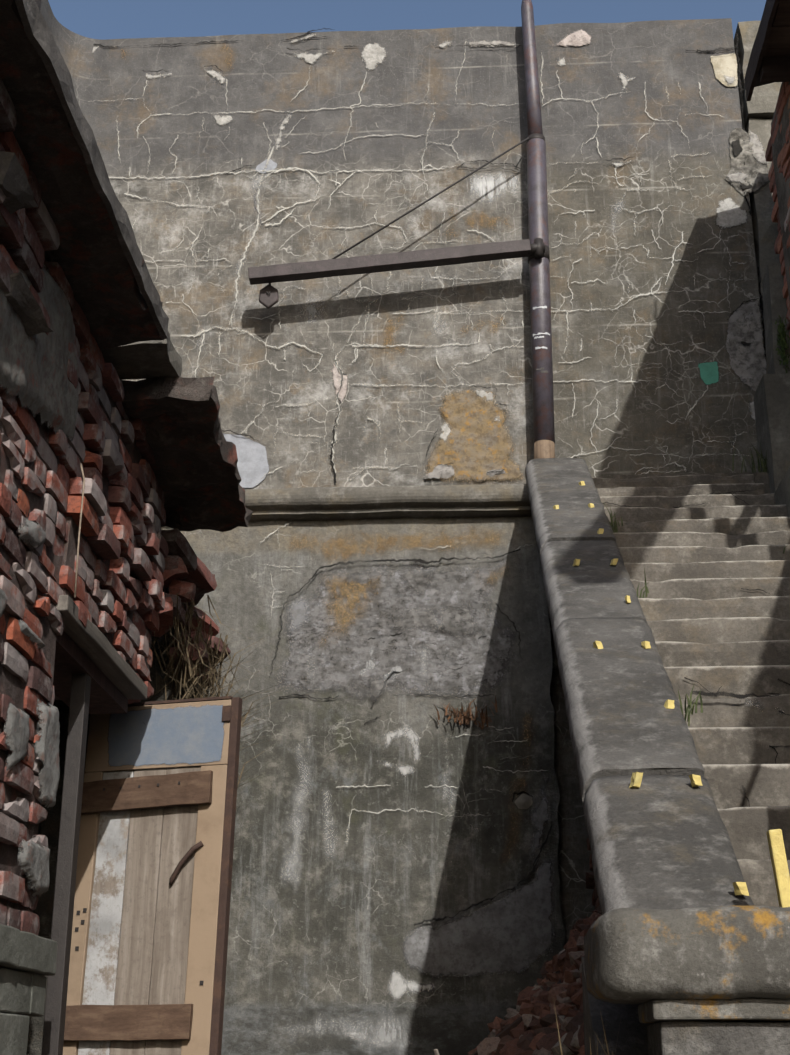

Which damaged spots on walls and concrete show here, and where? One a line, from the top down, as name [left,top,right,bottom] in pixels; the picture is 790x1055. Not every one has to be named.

crack [93,40,240,48]
spalling [287,34,331,64]
crack [286,28,356,47]
spalling [361,44,386,70]
spalling [710,50,738,87]
spalling [716,128,769,229]
crack [94,67,524,483]
crack [455,33,766,508]
peeling [0,265,79,448]
spalling [222,430,269,488]
spalling [423,385,523,483]
crack [269,566,304,615]